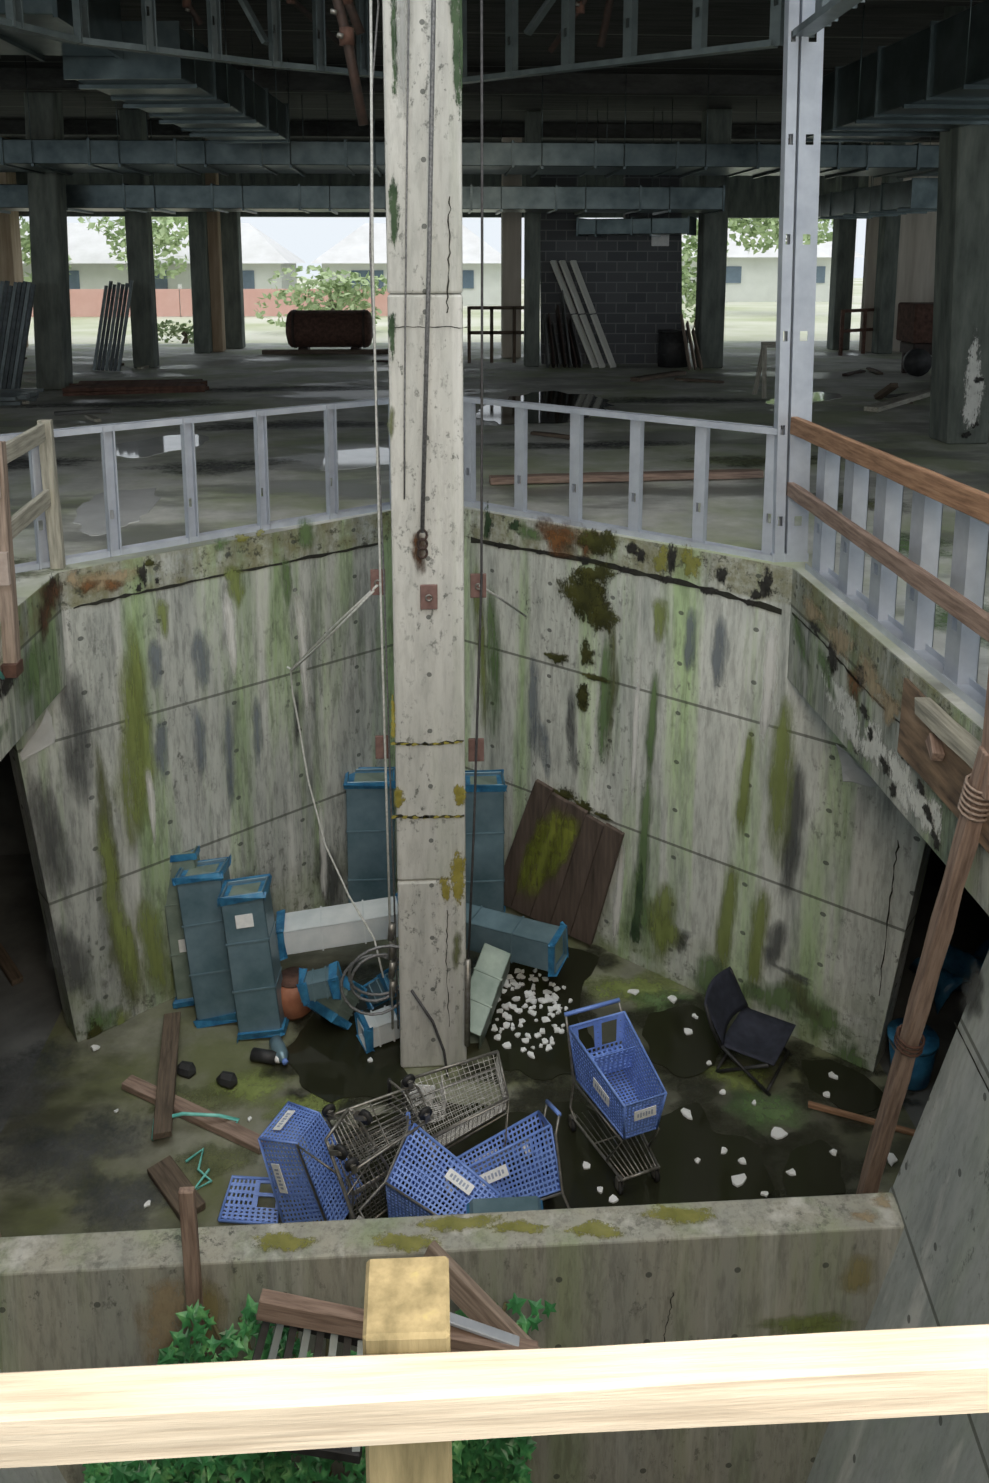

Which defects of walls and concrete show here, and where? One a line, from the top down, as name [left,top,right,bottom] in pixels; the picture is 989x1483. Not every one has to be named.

damp [450,0,463,121]
peeling [961,337,985,438]
rust [536,518,600,558]
rust [39,570,127,640]
damp [224,567,244,670]
damp [282,562,308,740]
damp [28,786,71,883]
damp [62,601,174,1002]
damp [736,629,803,889]
peeling [822,672,942,851]
damp [694,870,737,995]
damp [748,893,785,986]